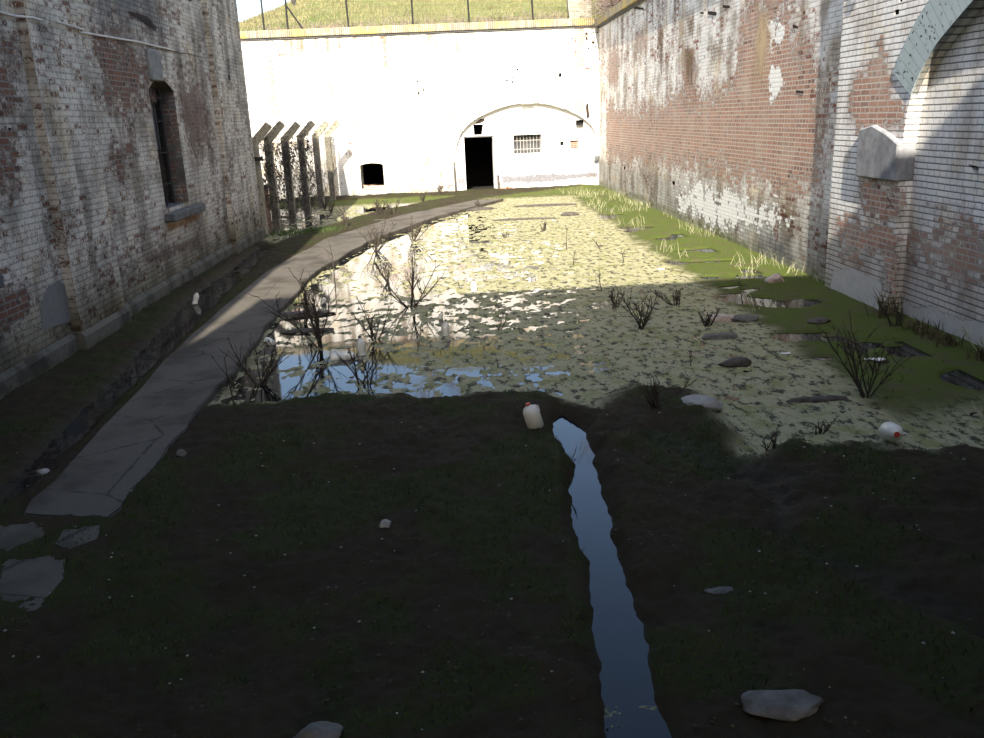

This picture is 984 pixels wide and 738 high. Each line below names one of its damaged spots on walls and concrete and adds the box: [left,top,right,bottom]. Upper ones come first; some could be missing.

flaking render [0,31,28,206]
flaking render [496,0,833,208]
flaking render [848,34,906,135]
flaking render [835,179,984,289]
flaking render [0,277,31,333]